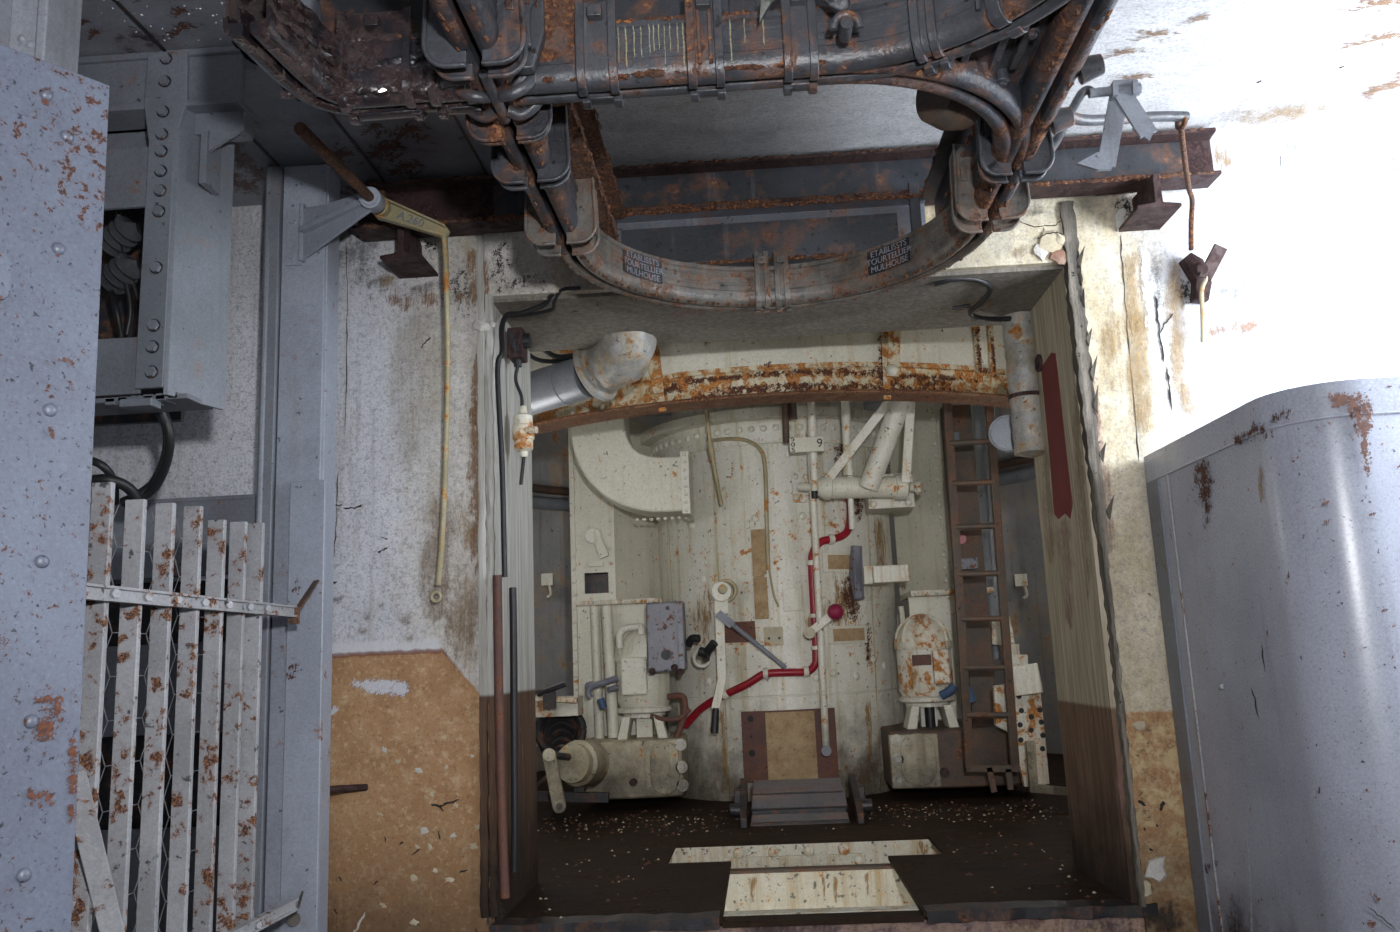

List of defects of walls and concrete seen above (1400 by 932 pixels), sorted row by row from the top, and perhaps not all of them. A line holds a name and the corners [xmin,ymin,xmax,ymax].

rust [1345,0,1400,14]
rust [1335,31,1400,51]
rust [1361,72,1400,103]
rust [233,144,266,195]
rust [332,121,432,179]
rust [383,251,489,311]
rust [643,327,997,403]
leakage [1102,242,1195,434]
rust [465,340,487,572]